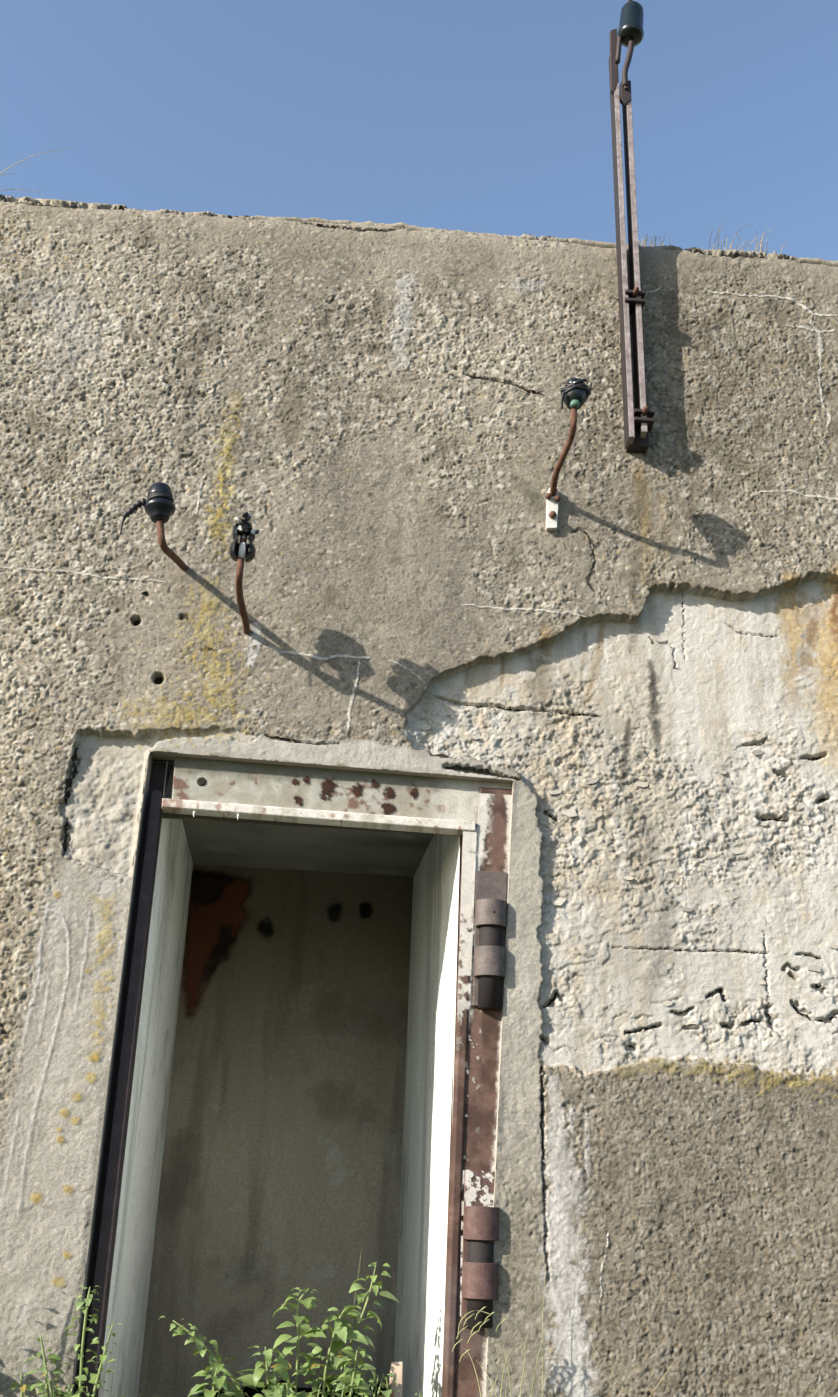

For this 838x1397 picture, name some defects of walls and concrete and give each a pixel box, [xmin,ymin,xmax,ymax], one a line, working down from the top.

crack [466,375,542,395]
crack [706,290,838,430]
crack [263,645,599,745]
corrosion [775,573,838,725]
crack [63,747,79,852]
spalling [402,573,838,1080]
corrosion [183,872,252,1017]
crack [612,931,770,1012]
peeling [460,1022,501,1316]
damp [540,1076,596,1397]